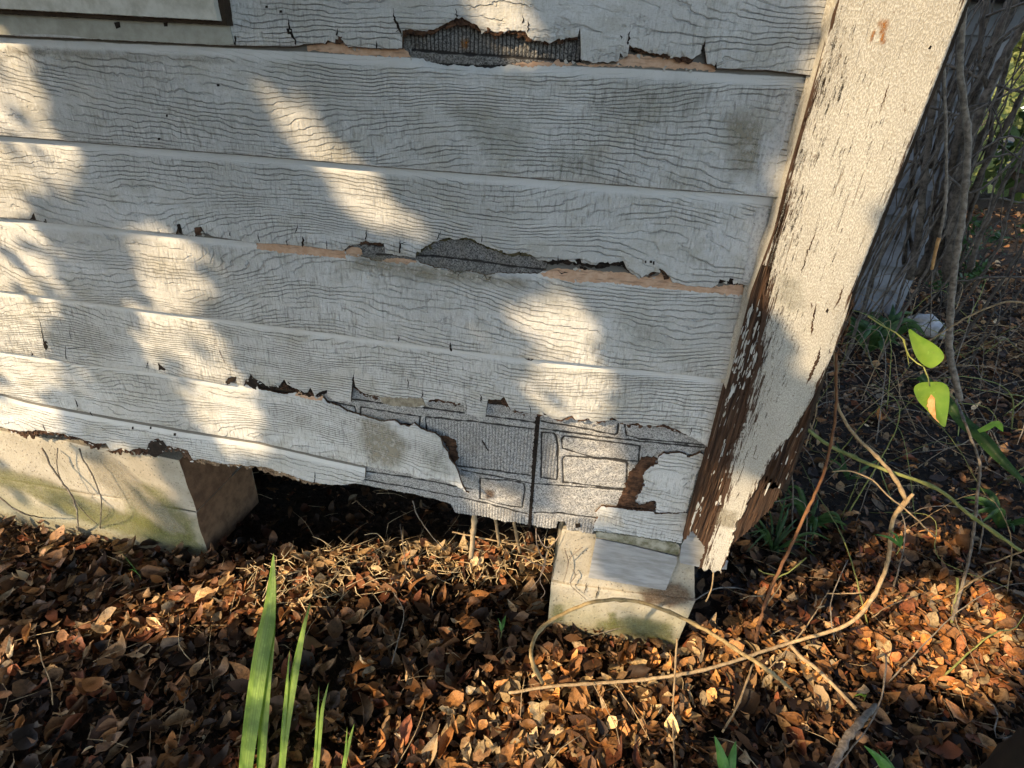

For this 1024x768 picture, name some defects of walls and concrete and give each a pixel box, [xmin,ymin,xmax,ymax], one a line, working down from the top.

peeling [307,35,412,60]
peeling [256,240,479,279]
peeling [512,5,883,545]
peeling [365,395,461,409]
crack [528,405,539,528]